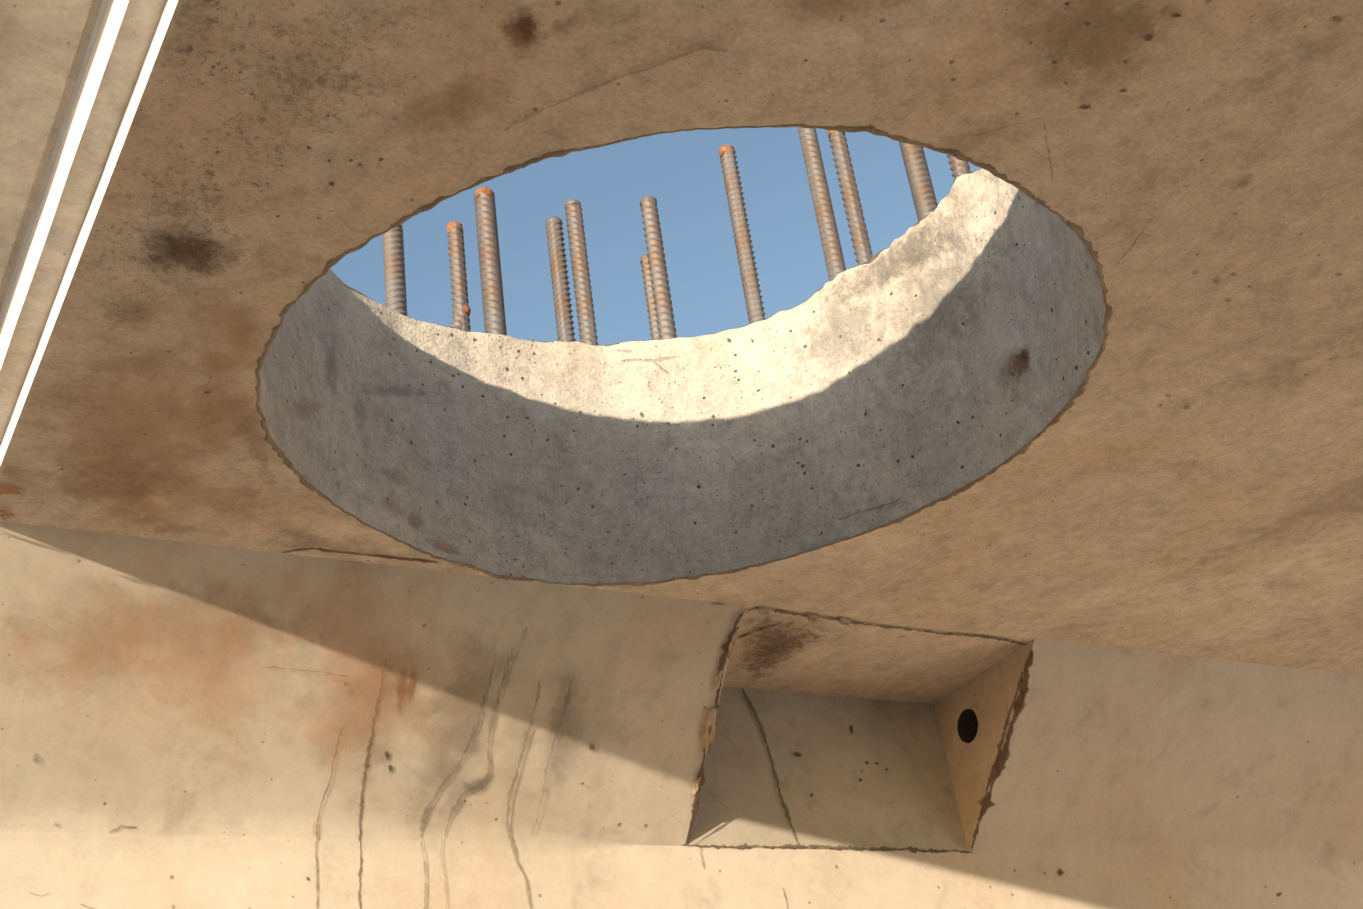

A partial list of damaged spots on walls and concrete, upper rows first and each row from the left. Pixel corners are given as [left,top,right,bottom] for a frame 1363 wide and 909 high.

leakage [505,19,534,46]
mould [151,235,228,273]
crack [315,662,414,909]